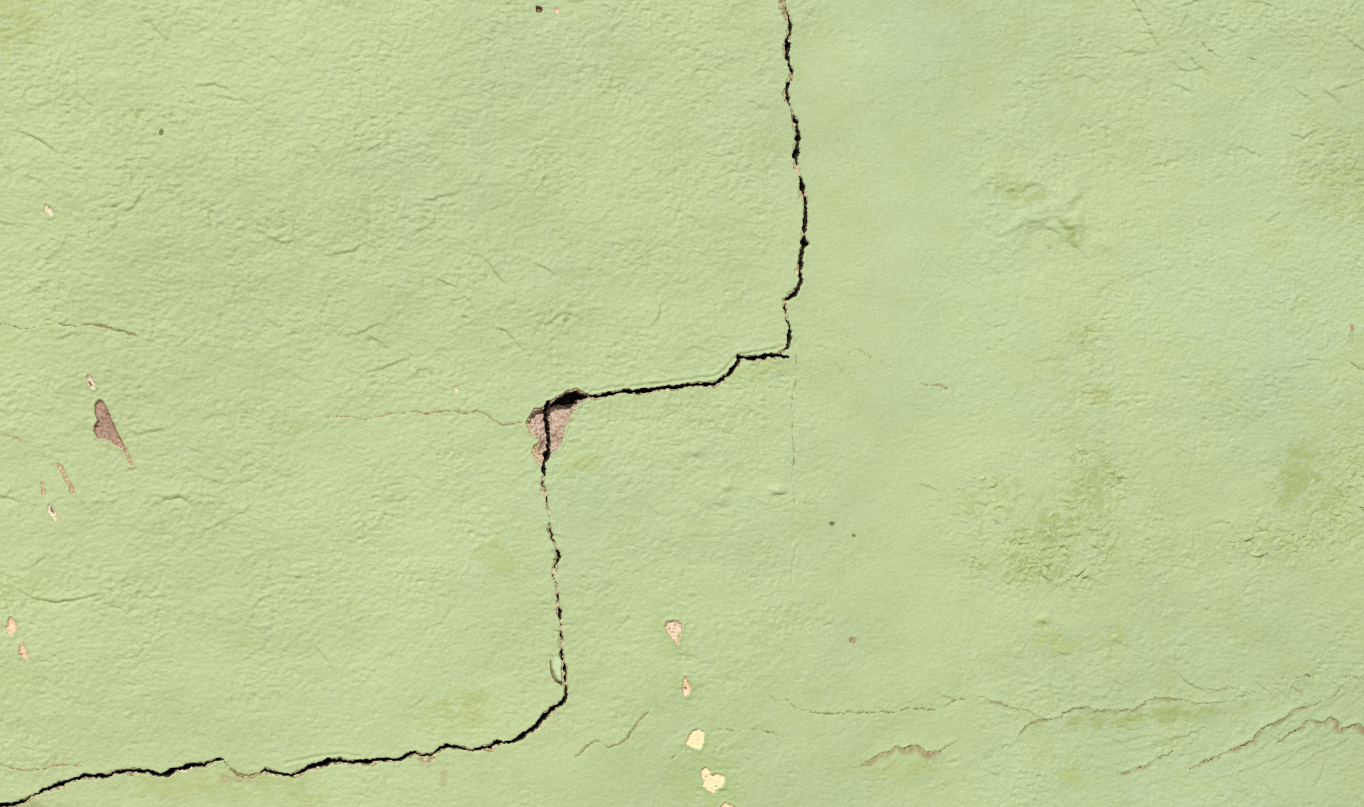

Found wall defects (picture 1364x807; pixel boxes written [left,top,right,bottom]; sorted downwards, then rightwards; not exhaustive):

crack [584,0,809,504]
crack [0,323,138,337]
peeling [86,375,134,466]
flaking render [526,388,590,467]
crack [0,400,568,807]
peeling [664,620,683,644]
peeling [682,677,690,696]
crack [575,711,650,758]
peeling [686,729,705,750]
peeling [701,767,734,807]